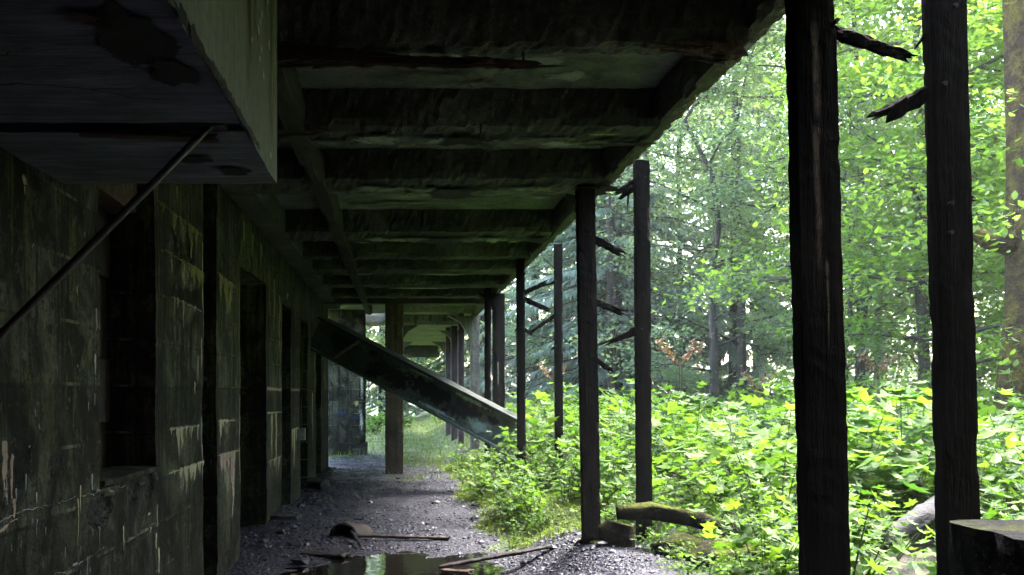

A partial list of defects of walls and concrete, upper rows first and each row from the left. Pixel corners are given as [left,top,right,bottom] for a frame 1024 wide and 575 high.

water stain [2,440,17,518]
water stain [169,416,204,482]
water stain [218,411,240,504]